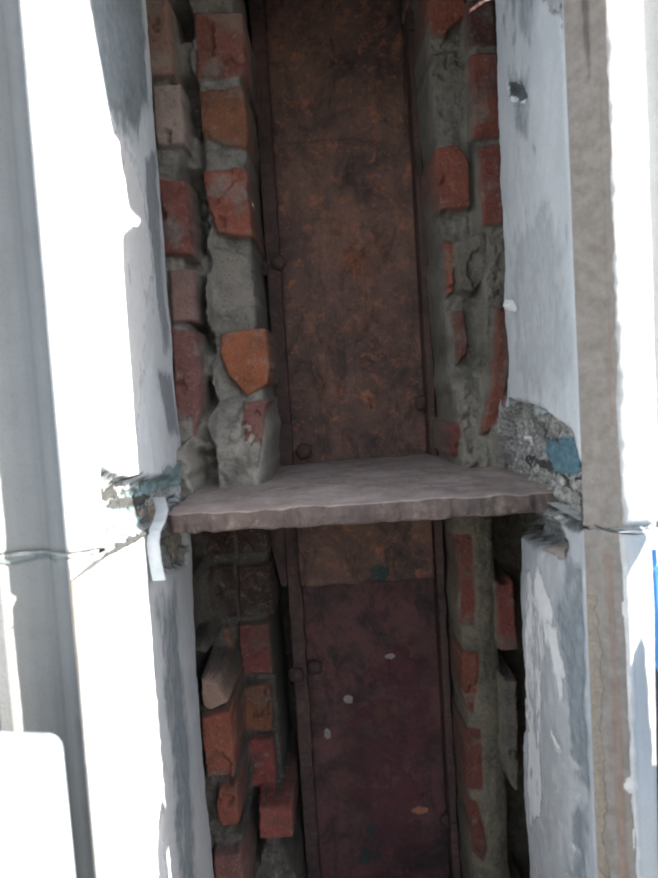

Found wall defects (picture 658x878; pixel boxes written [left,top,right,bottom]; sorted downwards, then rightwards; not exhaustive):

water stain [64,0,147,134]
spalling [100,461,181,564]
spalling [496,398,585,559]